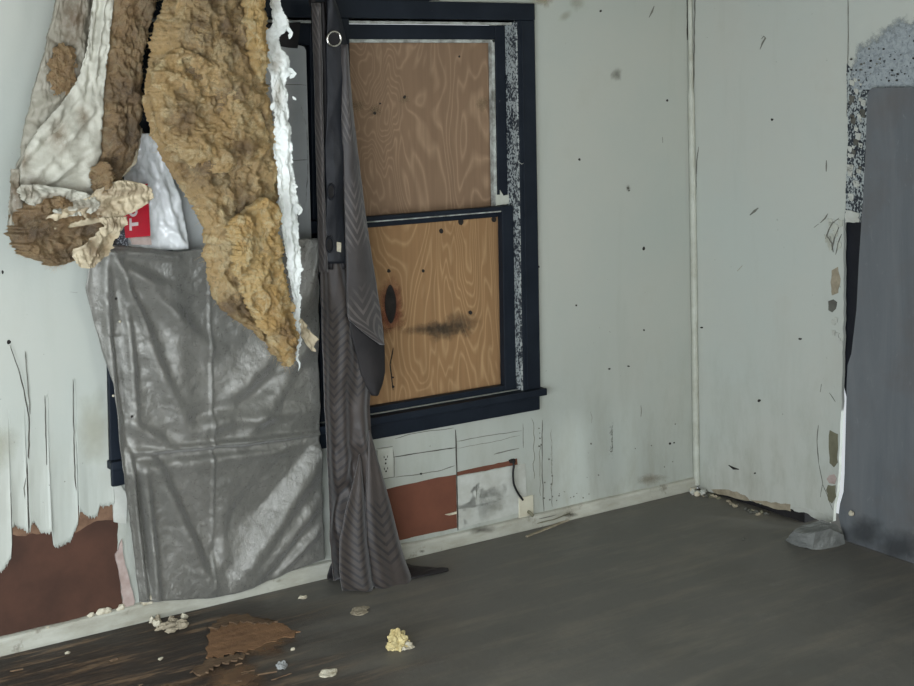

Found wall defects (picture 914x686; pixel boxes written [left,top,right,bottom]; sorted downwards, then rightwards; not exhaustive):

peeling [0,389,153,636]
peeling [387,459,518,540]